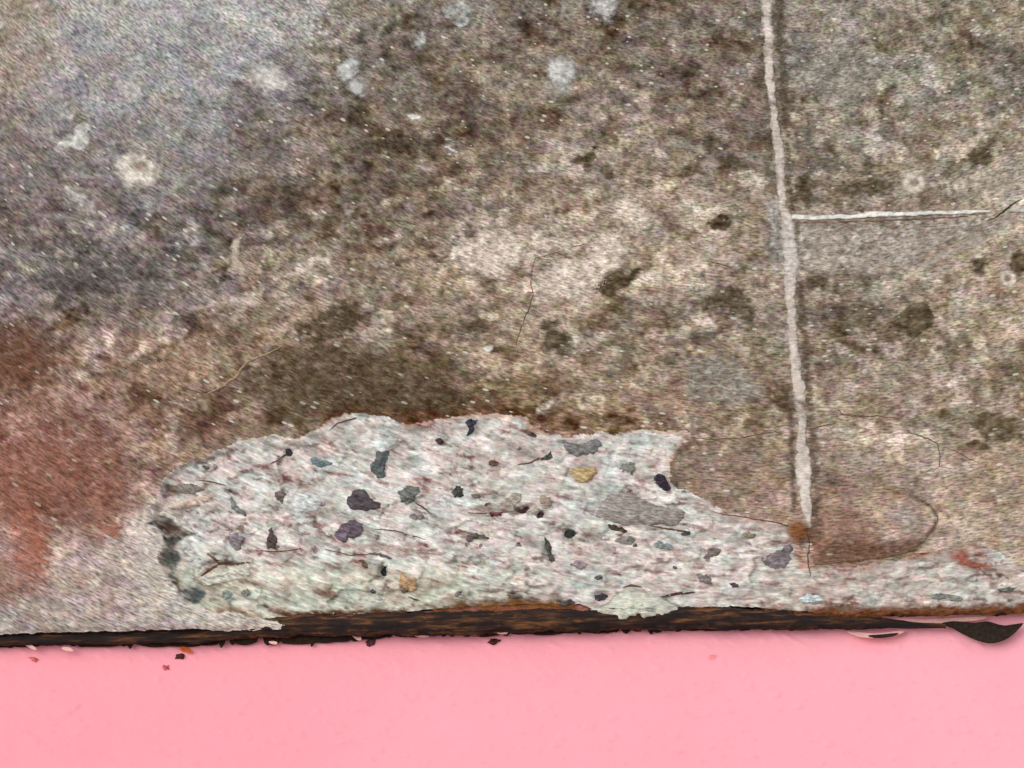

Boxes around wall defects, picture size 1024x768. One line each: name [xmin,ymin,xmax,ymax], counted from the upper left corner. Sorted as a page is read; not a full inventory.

crack [909,199,1022,268]
corrosion [0,326,129,601]
spalling [148,413,1024,643]
corrosion [787,521,807,542]
corrosion [0,597,1024,653]